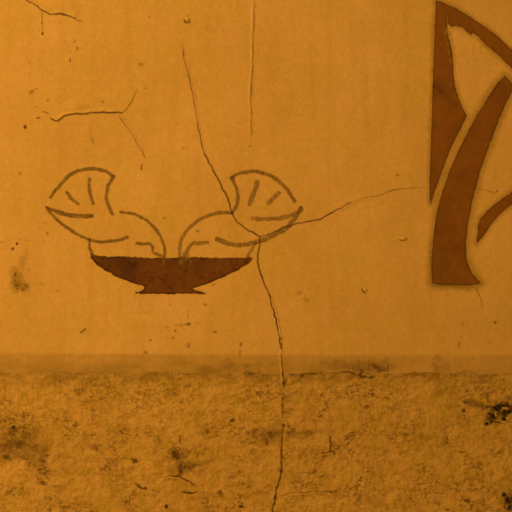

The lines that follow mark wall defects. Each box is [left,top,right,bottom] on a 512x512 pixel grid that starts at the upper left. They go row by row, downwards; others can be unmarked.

crack [26,0,79,19]
crack [246,0,254,138]
crack [51,107,145,153]
crack [182,45,380,385]
crack [272,424,284,512]
crack [319,436,336,458]